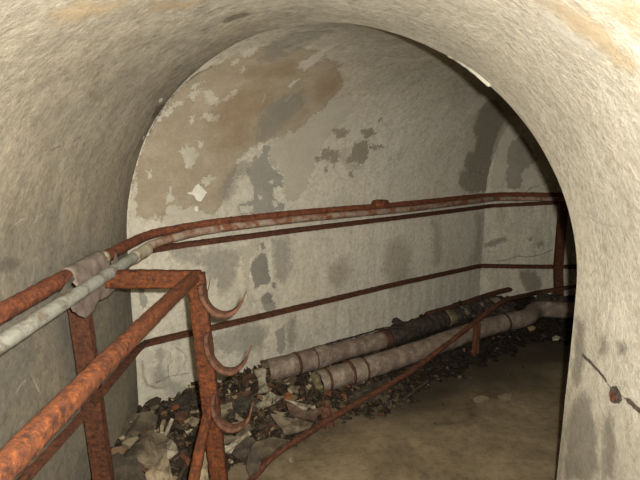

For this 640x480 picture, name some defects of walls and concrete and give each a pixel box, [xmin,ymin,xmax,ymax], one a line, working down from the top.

peeling [127,37,349,239]
flaking render [315,129,384,178]
water stain [459,100,503,193]
flaking render [241,243,276,304]
peeling [131,289,141,321]
crack [582,354,606,382]
crack [627,398,640,413]